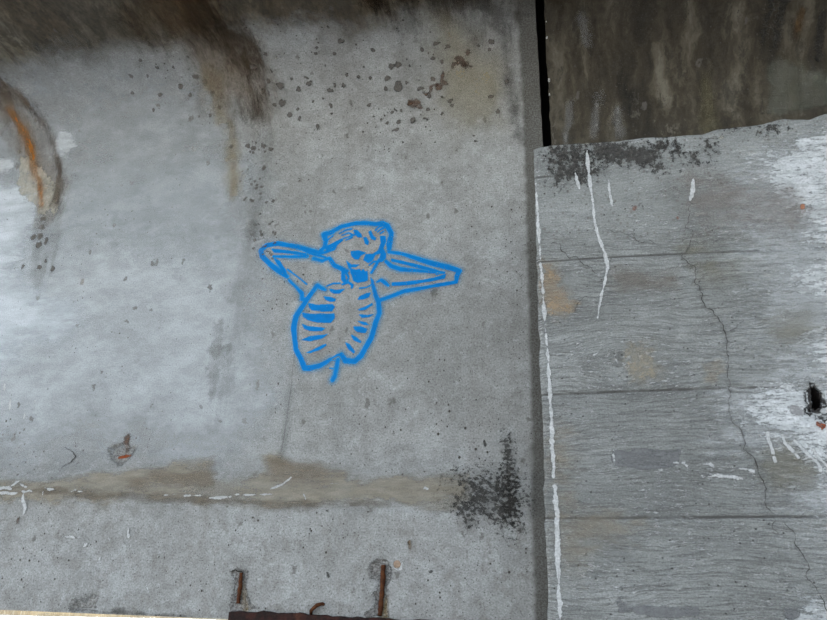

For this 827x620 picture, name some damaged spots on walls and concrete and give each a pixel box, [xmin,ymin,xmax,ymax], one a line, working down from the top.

corrosion [0,79,61,216]
peeling [701,123,827,517]
spalling [108,434,136,466]
damp [437,428,537,547]
peeling [611,448,689,470]
crack [682,201,827,611]
peeling [616,599,700,618]
peeling [781,586,827,620]